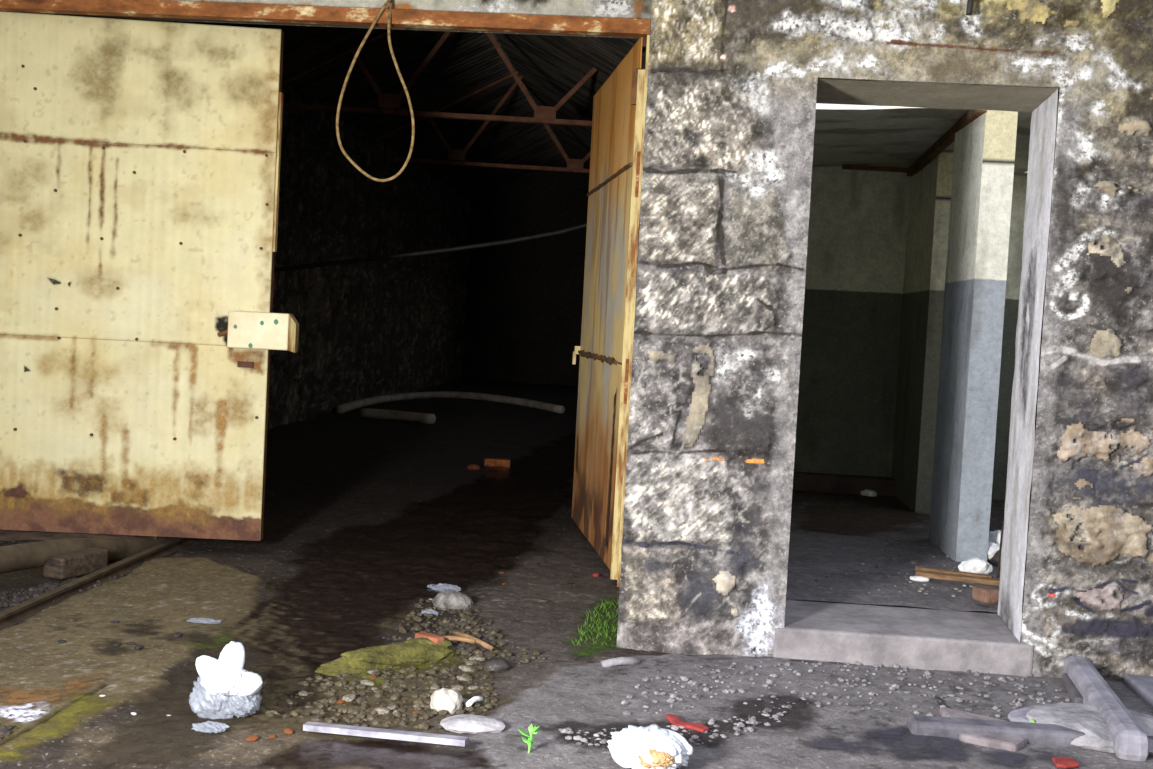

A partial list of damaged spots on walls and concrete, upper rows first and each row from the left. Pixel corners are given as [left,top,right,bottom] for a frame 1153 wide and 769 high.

leakage [455,0,545,13]
leakage [589,0,648,18]
flaking render [1005,0,1080,28]
flaking render [1100,0,1119,18]
leakage [721,0,982,114]
leakage [1000,0,1153,415]
leakage [1059,412,1089,429]
spalling [1057,418,1153,477]
spalling [1052,479,1153,567]